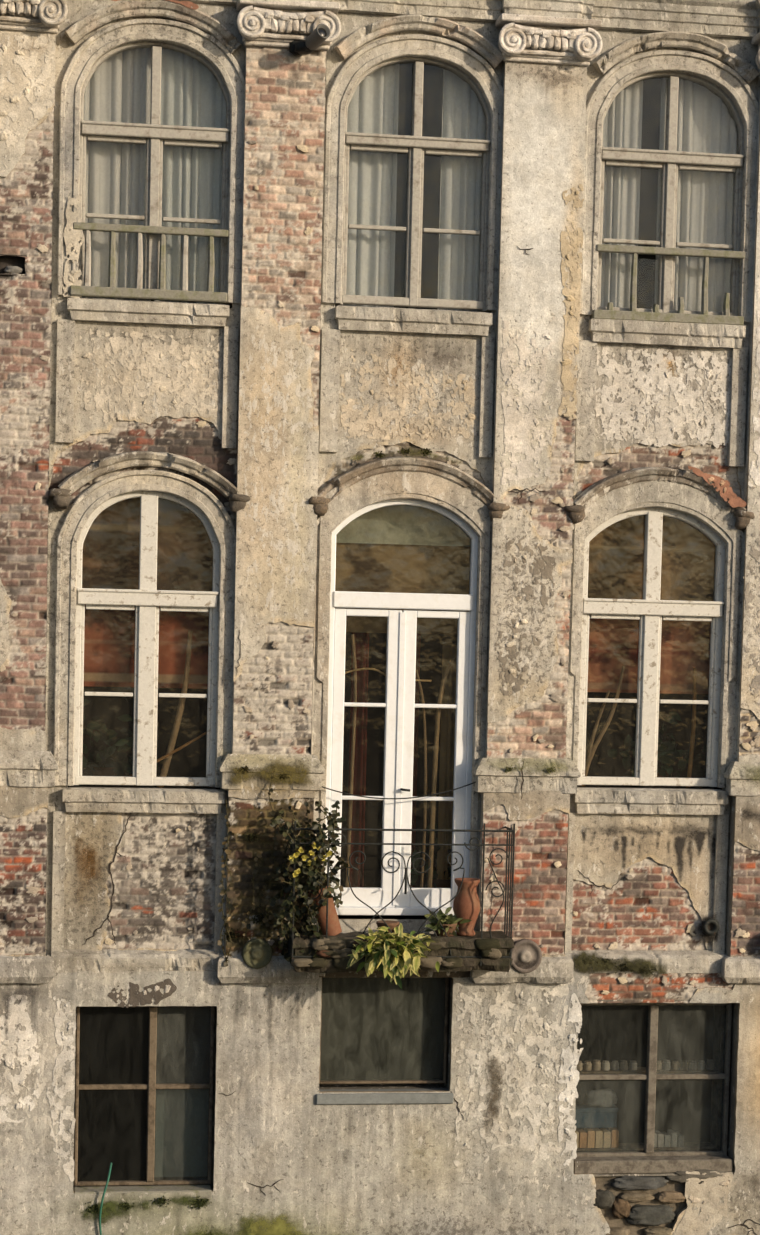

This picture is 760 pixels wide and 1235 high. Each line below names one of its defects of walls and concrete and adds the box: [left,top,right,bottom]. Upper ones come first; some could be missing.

flaking render [241,46,326,427]
flaking render [0,33,237,731]
peeling [487,184,760,759]
flaking render [232,621,314,755]
flaking render [0,807,47,956]
crack [83,817,130,945]
flaking render [102,797,314,956]
flaking render [480,804,707,955]
leakage [583,827,716,881]
flaking render [730,841,760,957]
peeling [0,995,76,1182]
peeling [673,1171,733,1235]